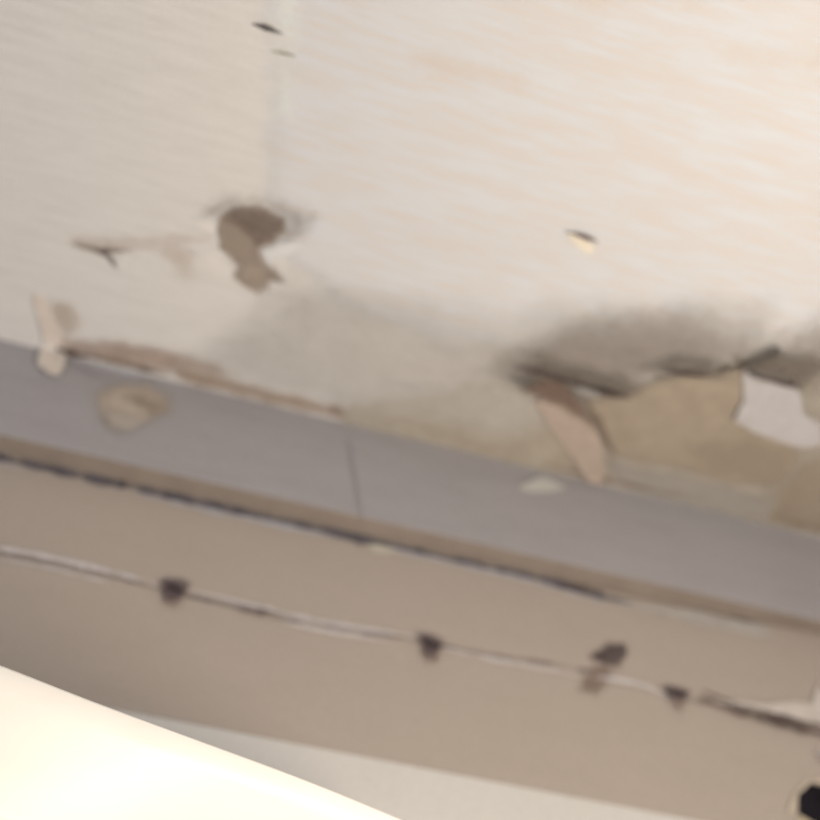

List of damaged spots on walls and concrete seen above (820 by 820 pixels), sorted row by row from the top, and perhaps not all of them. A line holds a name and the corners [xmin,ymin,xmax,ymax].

spalling [190,189,322,294]
peeling [32,295,86,376]
peeling [515,349,820,530]
damp [517,476,566,493]
peeling [715,685,820,724]
spalling [787,778,820,820]